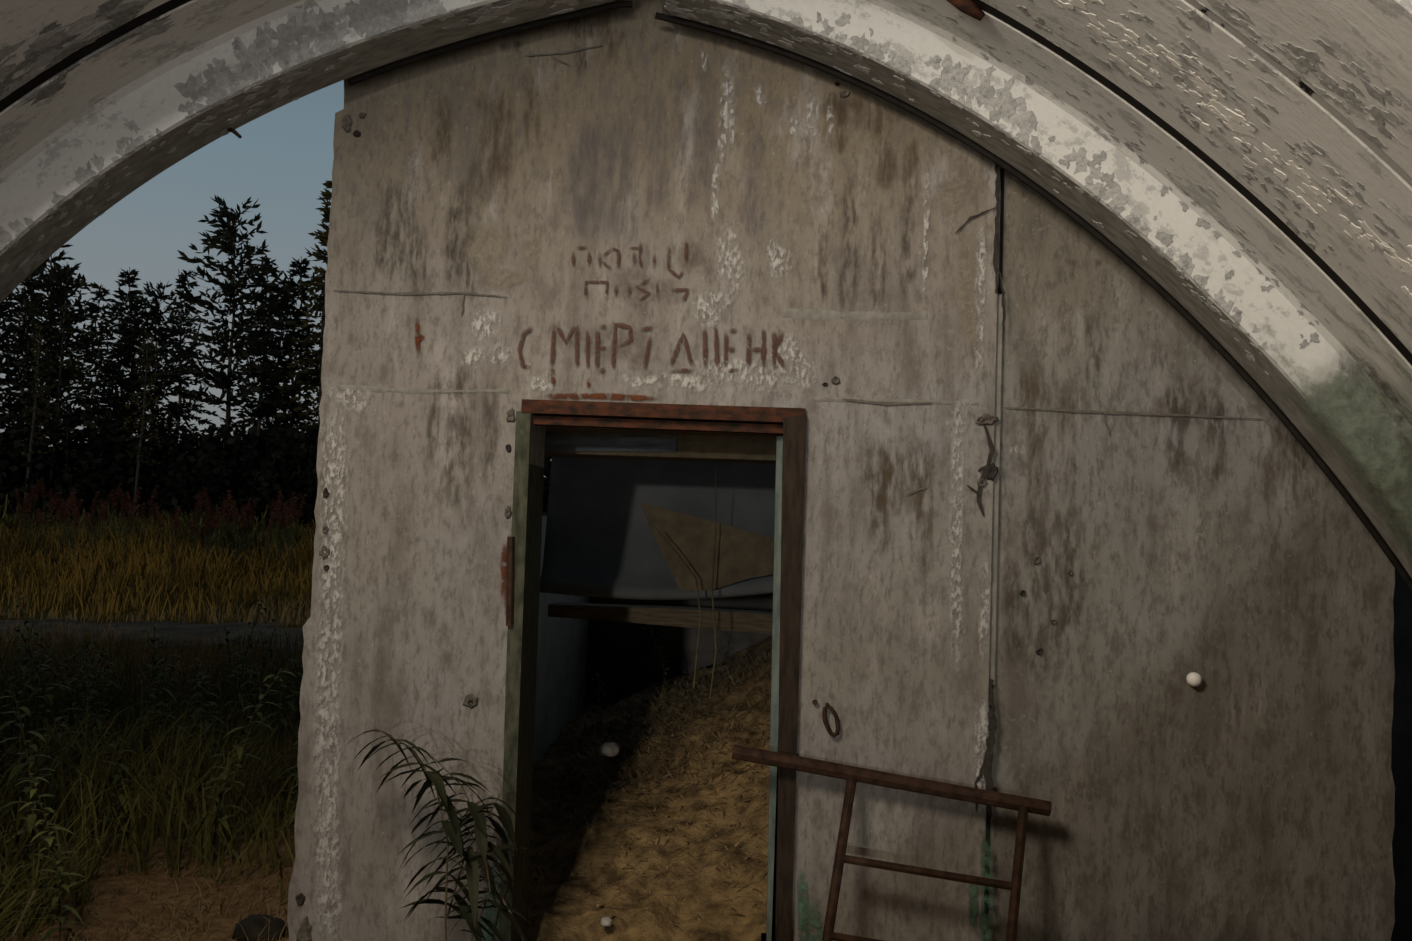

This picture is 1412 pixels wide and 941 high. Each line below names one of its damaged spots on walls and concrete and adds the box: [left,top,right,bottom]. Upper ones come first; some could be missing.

peeling [0,0,175,107]
peeling [174,0,579,137]
rust [946,0,985,21]
peeling [0,120,177,273]
water stain [696,229,743,326]
water stain [711,66,734,218]
crack [955,154,1006,341]
peeling [664,0,1412,375]
water stain [622,335,814,391]
crack [967,407,1263,516]
water stain [946,400,970,663]
water stain [974,703,989,805]